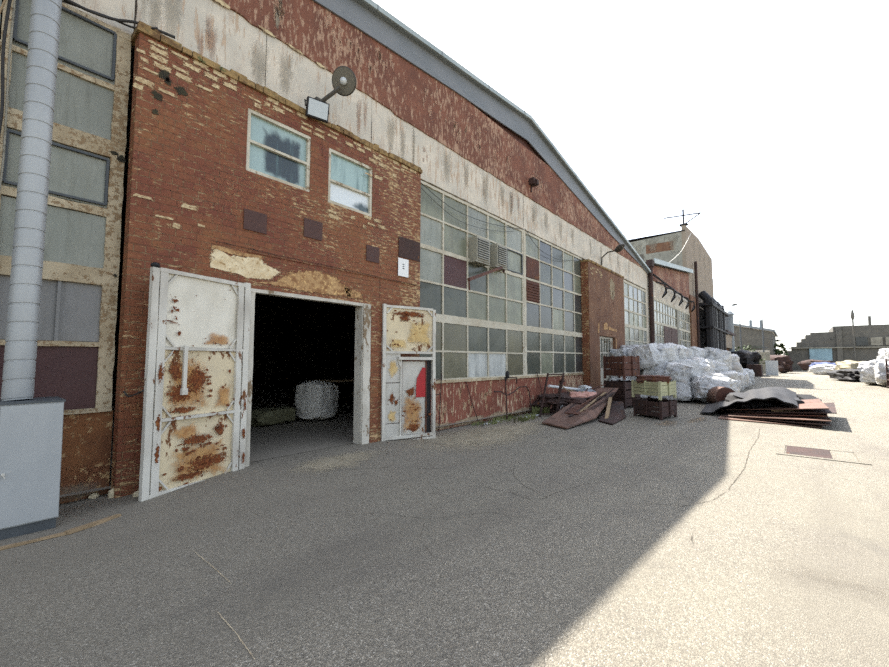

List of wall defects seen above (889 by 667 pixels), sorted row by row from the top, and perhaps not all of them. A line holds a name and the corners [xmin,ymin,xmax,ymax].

peeling [133,39,237,98]
peeling [320,14,395,79]
peeling [249,96,416,187]
spalling [210,245,363,299]
rust [388,307,424,335]
rust [155,333,246,491]
rust [387,387,431,432]
crack [649,429,760,506]